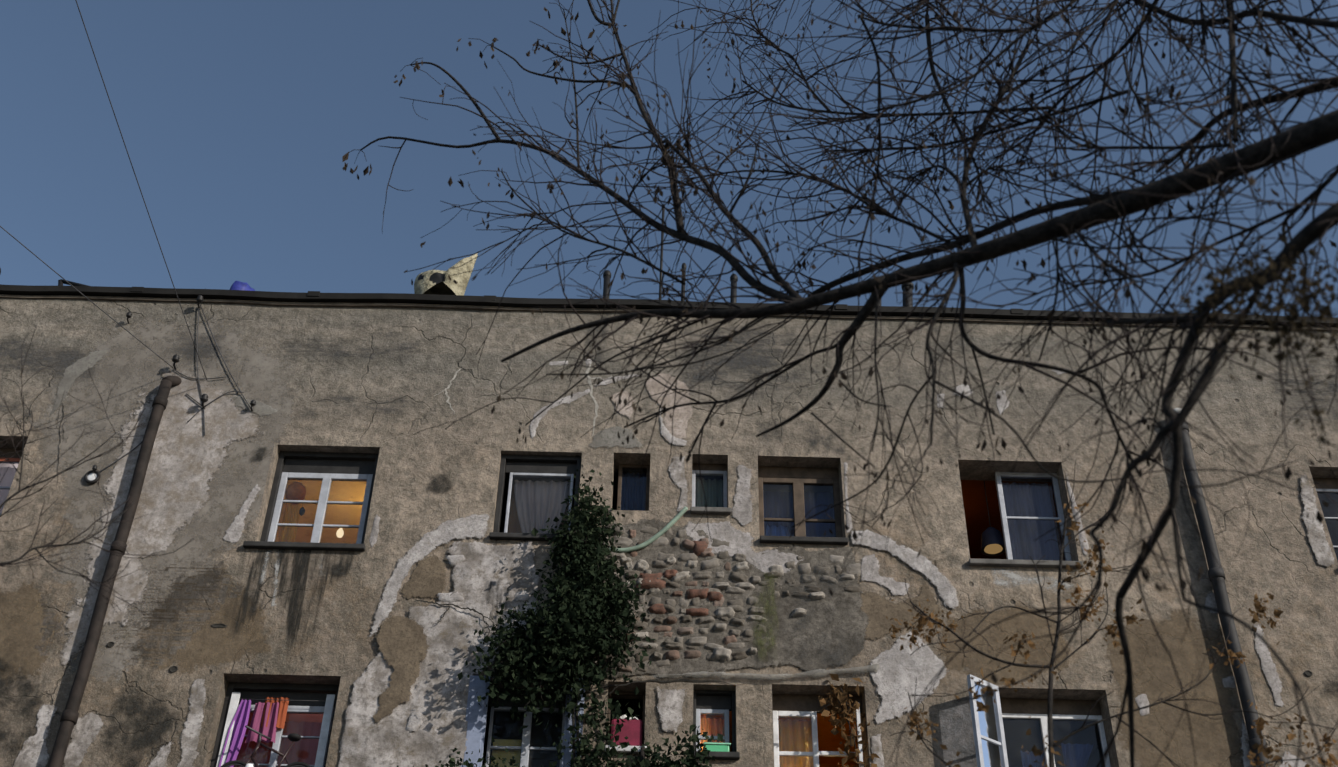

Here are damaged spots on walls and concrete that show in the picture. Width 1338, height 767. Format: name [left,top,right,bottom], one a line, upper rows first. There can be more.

flaking render [51,348,110,415]
flaking render [60,369,278,665]
damp [235,550,353,646]
flaking render [338,514,541,767]
flaking render [635,462,959,767]
flaking render [1299,474,1335,568]